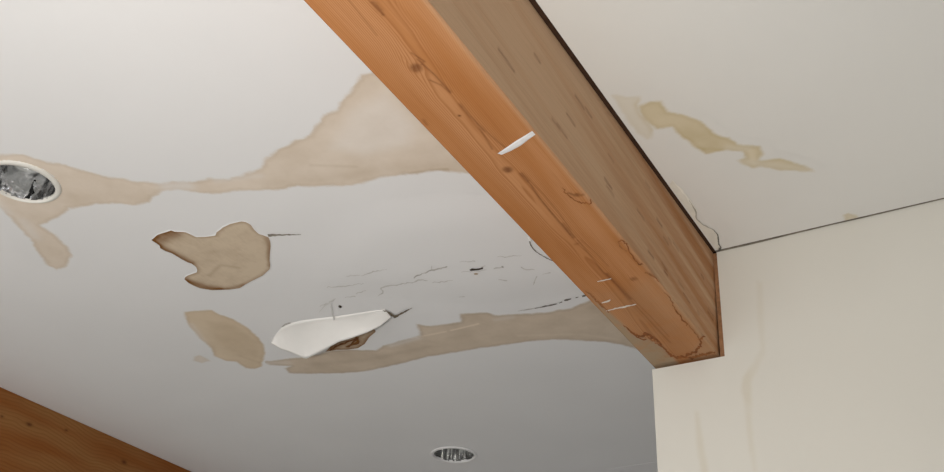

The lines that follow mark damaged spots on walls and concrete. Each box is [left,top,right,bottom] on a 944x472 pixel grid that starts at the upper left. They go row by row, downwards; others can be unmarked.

water stain [602,87,828,179]
water stain [0,65,475,274]
peeling [150,220,301,290]
peeling [271,299,411,359]
crack [321,237,552,306]
water stain [176,290,715,377]
crack [520,295,586,311]